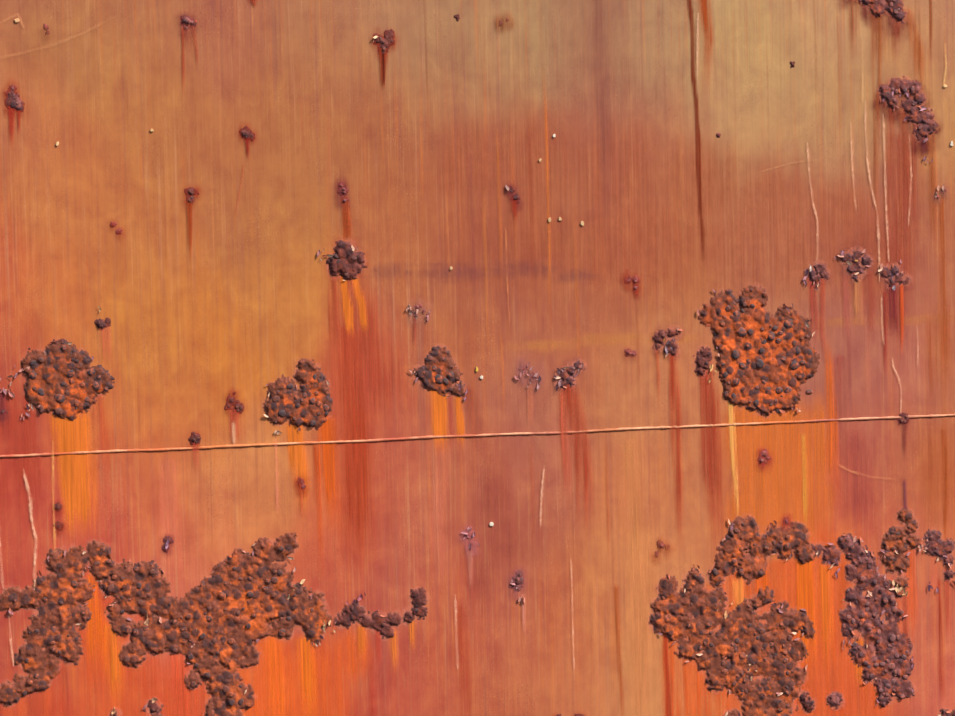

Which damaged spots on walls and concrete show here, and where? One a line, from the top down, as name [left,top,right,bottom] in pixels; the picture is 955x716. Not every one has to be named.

corrosion [0,339,115,533]
corrosion [263,182,471,534]
corrosion [687,0,712,248]
corrosion [693,0,947,498]
corrosion [0,533,428,716]
corrosion [648,457,955,716]